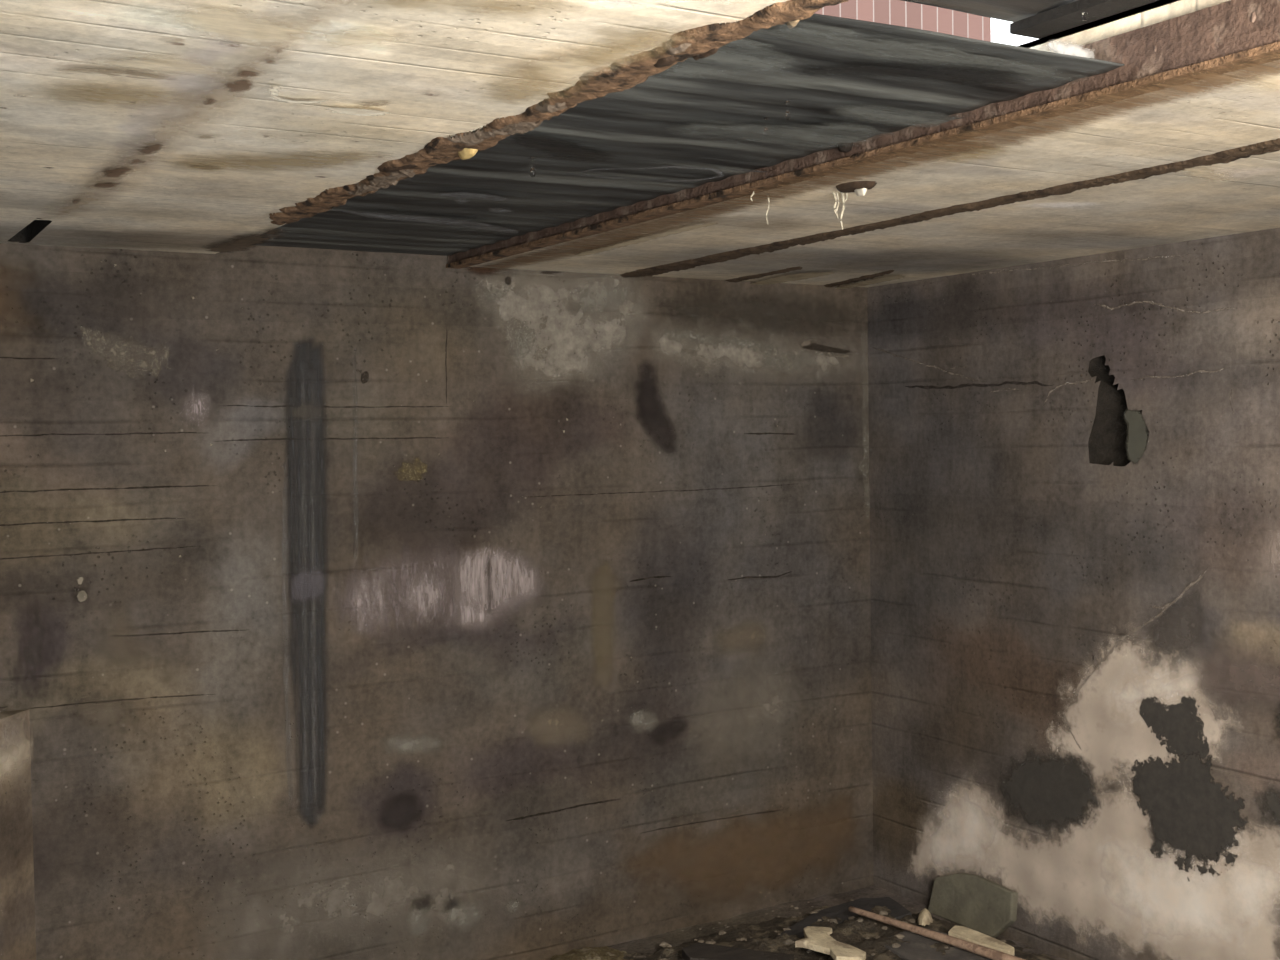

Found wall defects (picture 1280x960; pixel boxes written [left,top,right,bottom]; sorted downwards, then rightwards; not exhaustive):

peeling [521,48,633,78]
rust [383,139,440,173]
water stain [637,365,675,450]
spalling [1088,355,1149,467]
mould [999,751,1100,834]
mould [1129,696,1280,881]